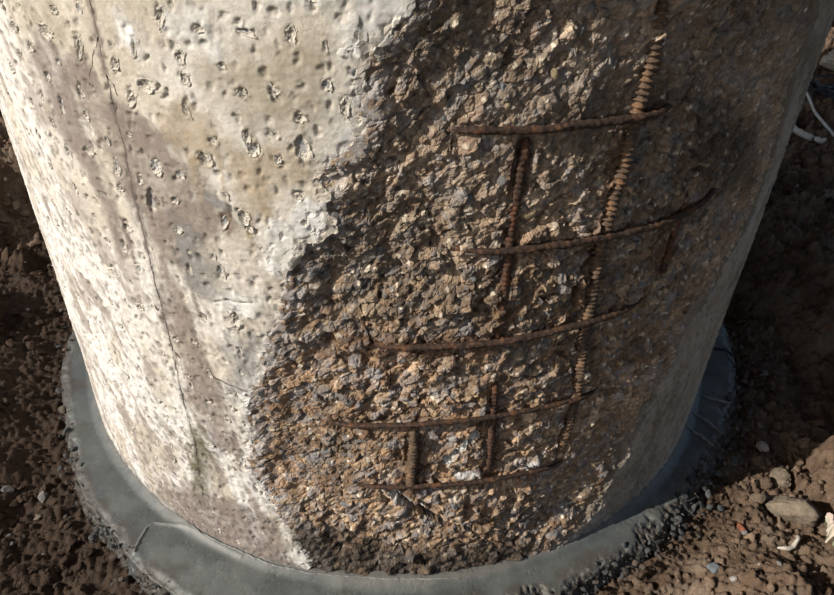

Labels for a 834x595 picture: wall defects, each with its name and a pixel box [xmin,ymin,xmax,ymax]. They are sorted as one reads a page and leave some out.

crack [89,0,117,109]
spalling [53,255,85,358]
crack [119,129,208,502]
spalling [219,0,820,595]
spalling [48,372,84,519]
spalling [86,517,162,594]